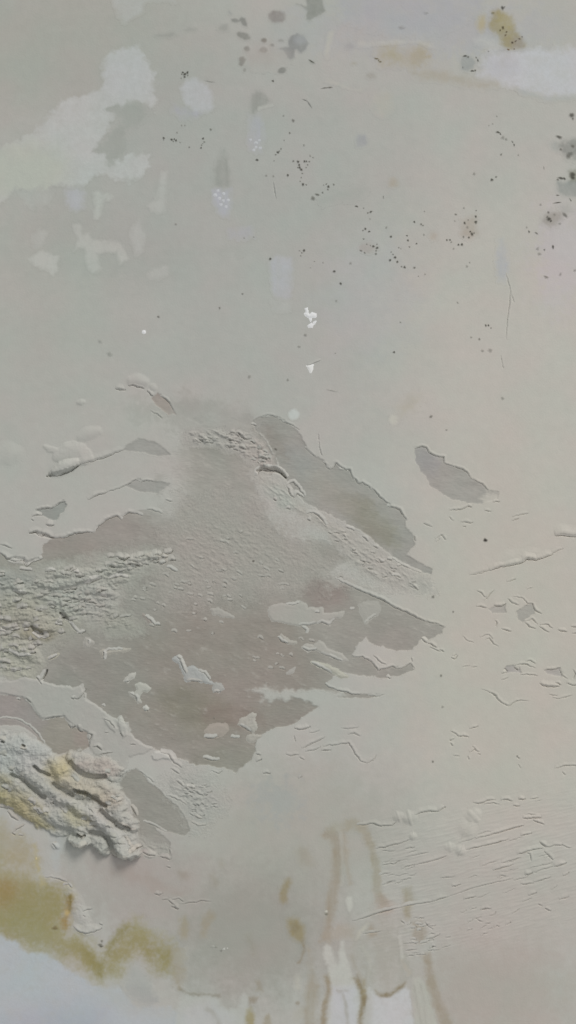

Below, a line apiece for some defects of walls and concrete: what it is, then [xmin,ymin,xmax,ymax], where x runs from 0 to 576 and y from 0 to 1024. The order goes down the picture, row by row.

damp [216,0,327,161]
damp [459,26,576,120]
damp [210,147,257,259]
damp [265,144,335,201]
damp [349,205,481,277]
damp [526,135,576,255]
peeling [115,383,174,418]
peeling [413,443,499,505]
crack [469,523,576,575]
peeling [0,412,446,868]
crack [422,631,572,706]
crack [351,794,571,934]